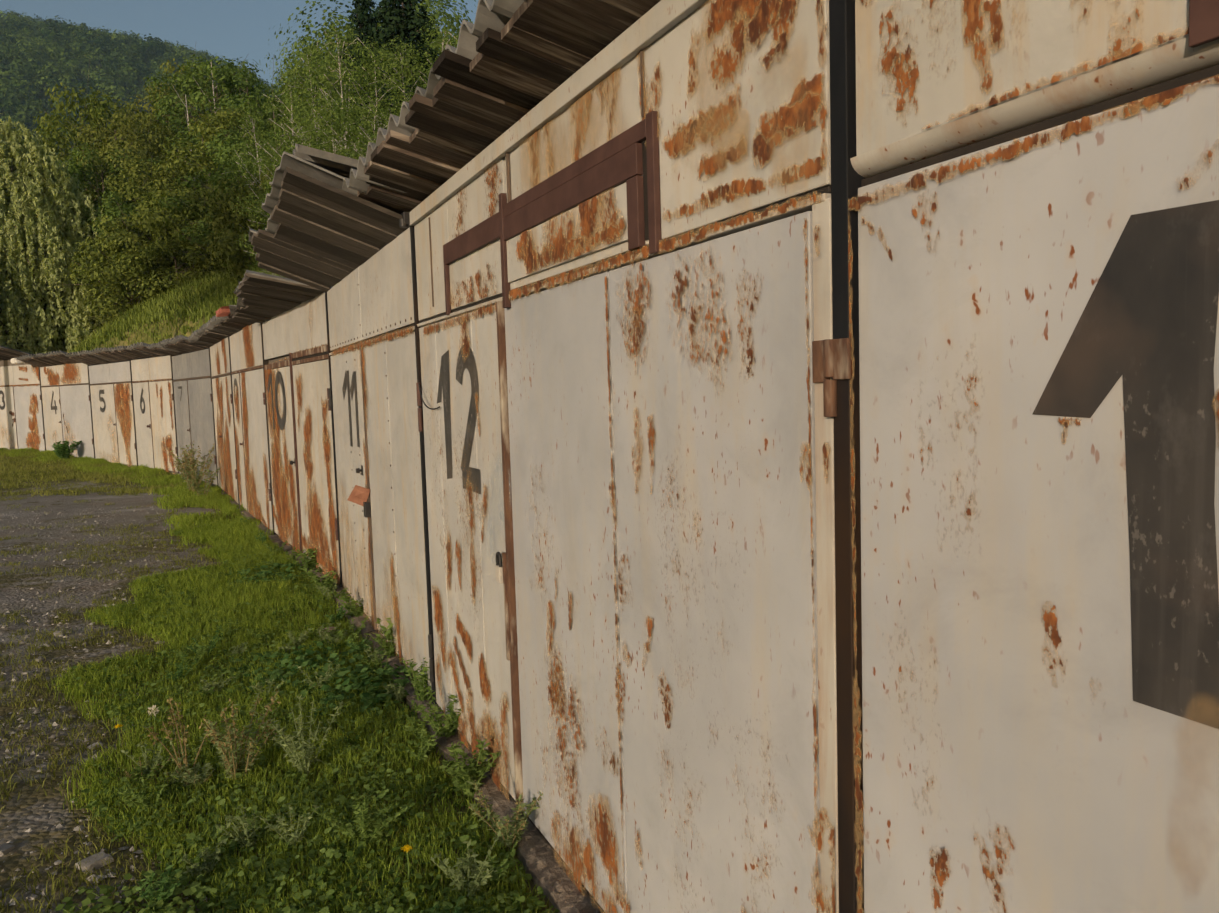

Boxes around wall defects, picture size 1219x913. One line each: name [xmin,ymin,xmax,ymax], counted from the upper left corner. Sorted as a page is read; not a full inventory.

rust [879,10,919,125]
rust [926,0,1189,129]
rust [848,74,1219,281]
rust [305,264,496,406]
rust [2,363,80,451]
rust [114,384,132,467]
rust [216,325,340,586]
rust [440,442,487,609]
rust [509,0,830,913]
rust [853,685,864,913]
rust [930,848,949,909]
rust [974,827,1014,913]